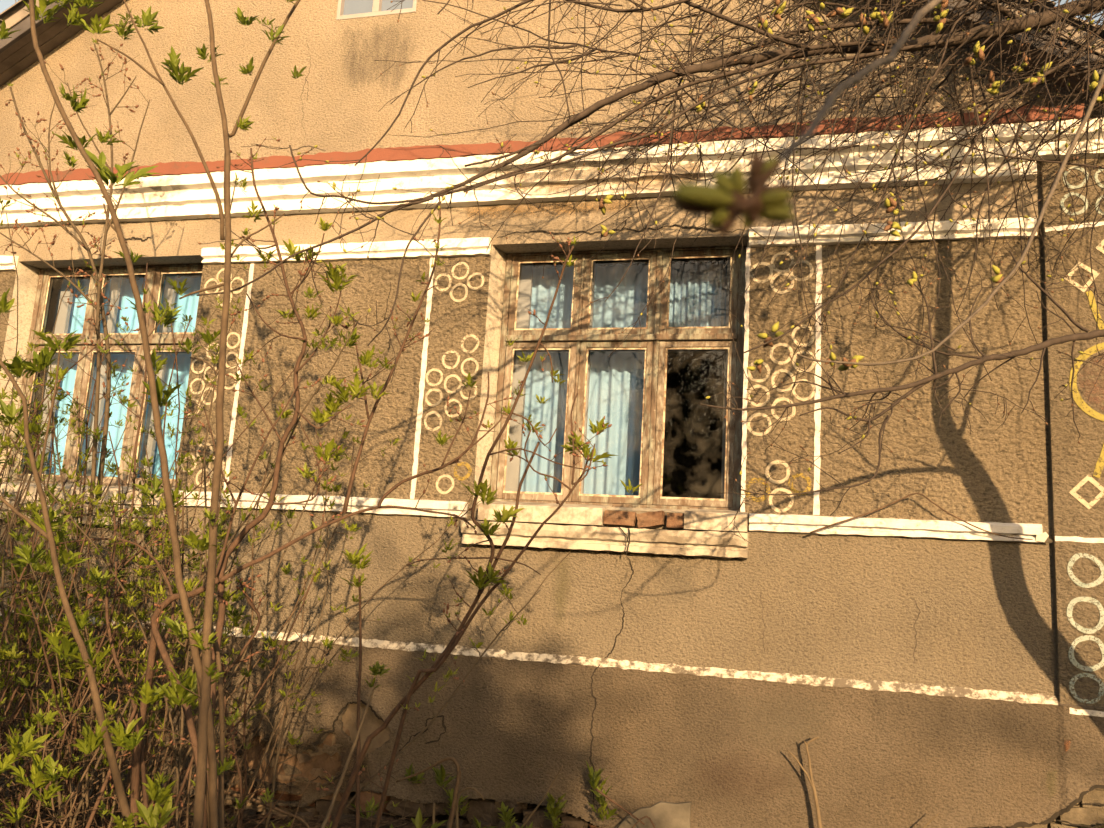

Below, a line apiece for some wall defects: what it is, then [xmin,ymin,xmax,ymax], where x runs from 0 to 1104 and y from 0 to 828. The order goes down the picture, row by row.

crack [589,527,634,806]
crack [224,700,384,790]
spalling [230,700,397,809]
crack [398,715,446,752]
spalling [1003,788,1104,828]